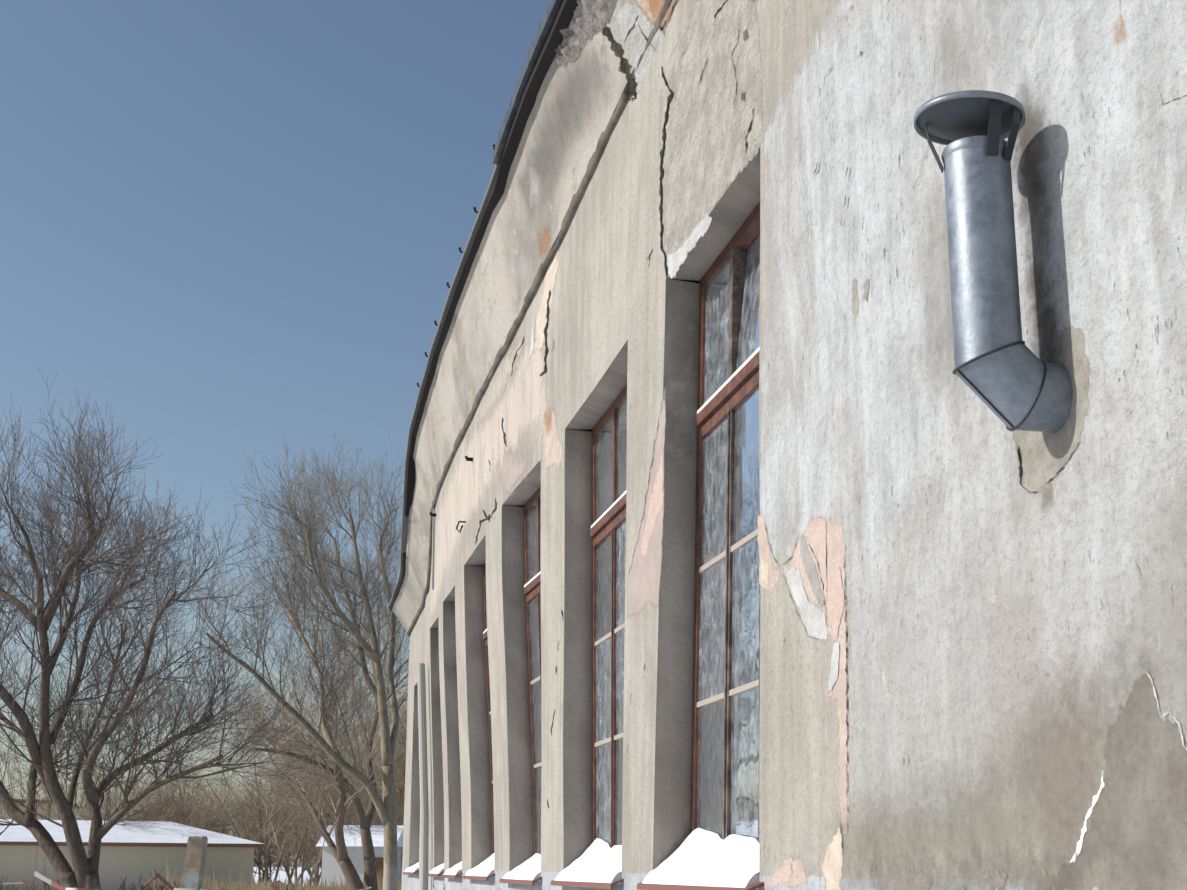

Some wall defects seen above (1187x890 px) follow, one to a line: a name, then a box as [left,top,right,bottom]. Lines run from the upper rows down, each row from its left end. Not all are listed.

crack [602,27,638,101]
flaking render [555,0,764,279]
crack [475,500,497,544]
flaking render [627,317,699,616]
flaking render [1012,325,1090,505]
flaking render [757,514,850,890]
flaking render [1036,669,1187,890]